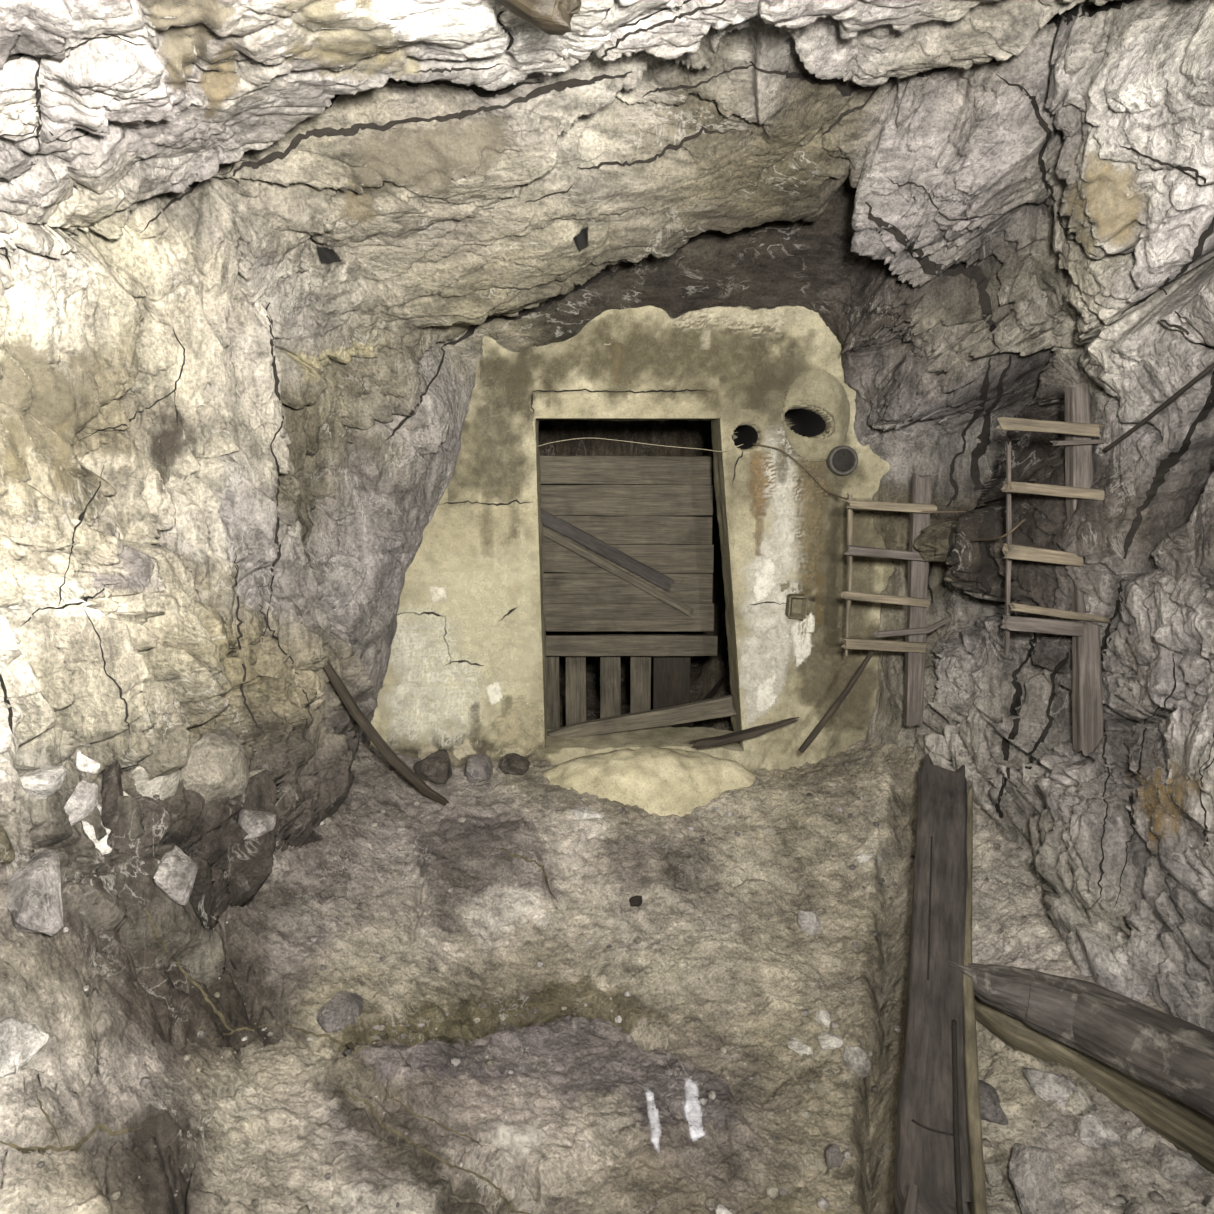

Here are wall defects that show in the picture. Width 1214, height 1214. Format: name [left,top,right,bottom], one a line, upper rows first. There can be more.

leakage [399,306,879,767]
peeling [739,430,827,723]